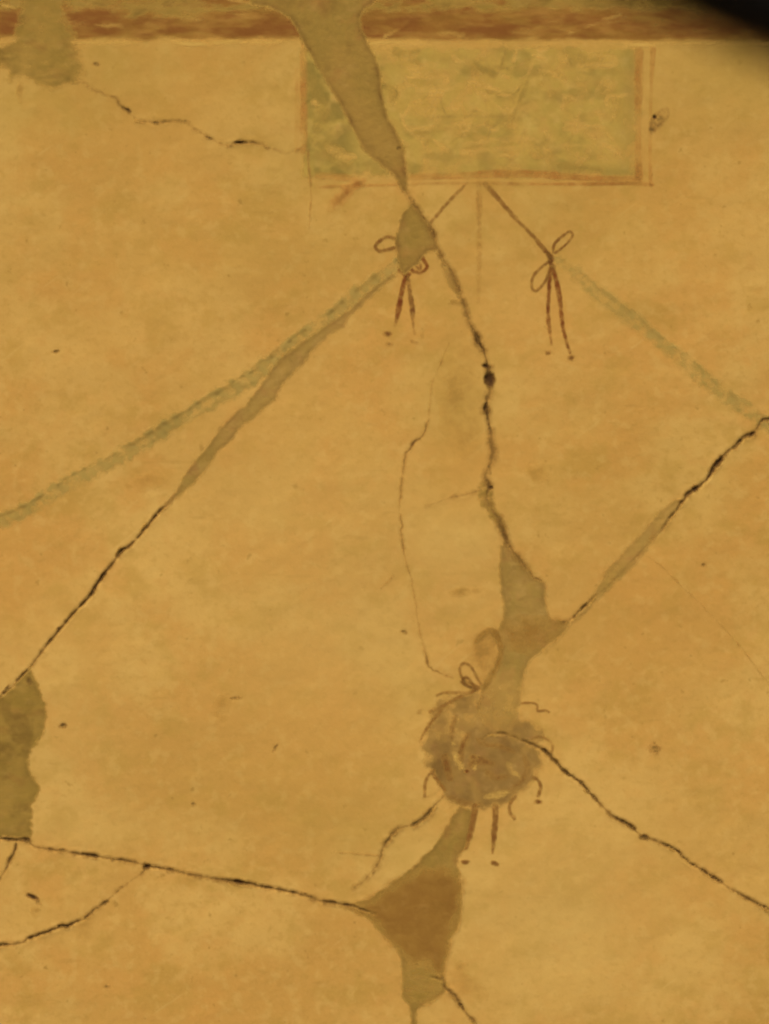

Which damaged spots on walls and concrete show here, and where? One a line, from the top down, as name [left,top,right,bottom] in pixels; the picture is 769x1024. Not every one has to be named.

crack [112,96,186,123]
crack [206,136,257,146]
crack [400,188,539,580]
crack [641,416,769,551]
crack [0,505,166,697]
crack [563,599,594,623]
crack [0,797,443,947]
leakage [357,868,462,973]
crack [484,733,769,912]
crack [435,977,477,1024]